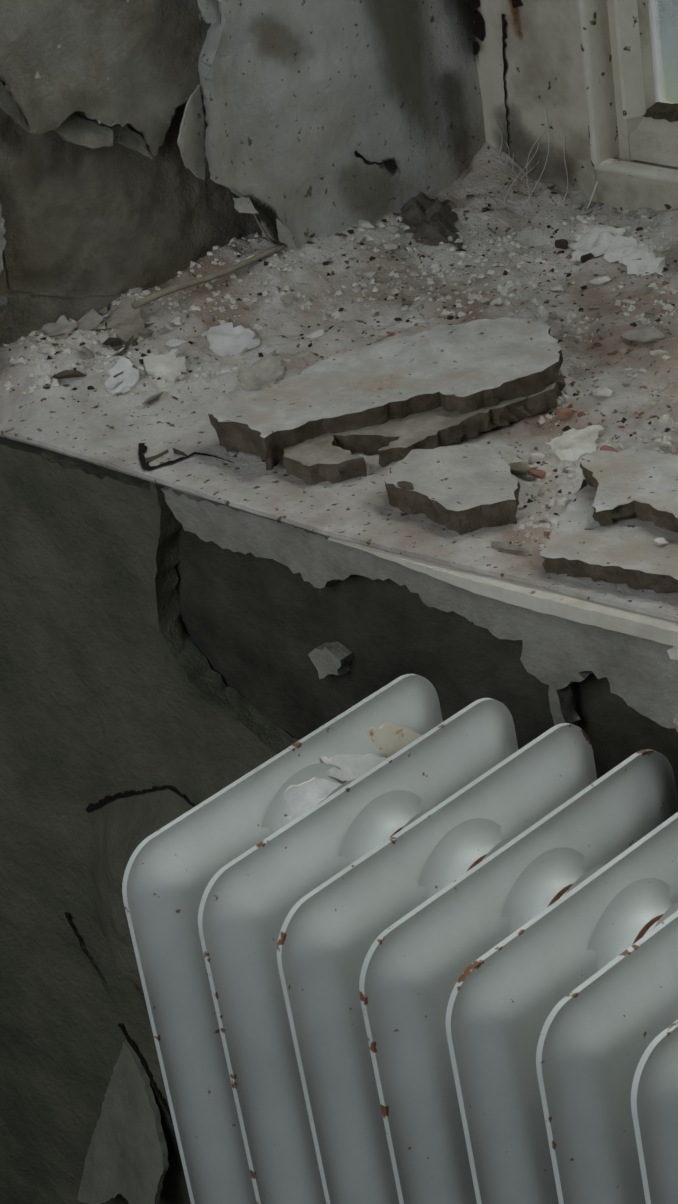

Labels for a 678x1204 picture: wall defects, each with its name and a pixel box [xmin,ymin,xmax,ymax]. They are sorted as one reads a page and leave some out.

spalling [0,0,376,358]
peeling [52,370,86,379]
peeling [142,391,179,404]
peeling [527,425,604,491]
spalling [161,487,678,798]
peeling [282,723,422,819]